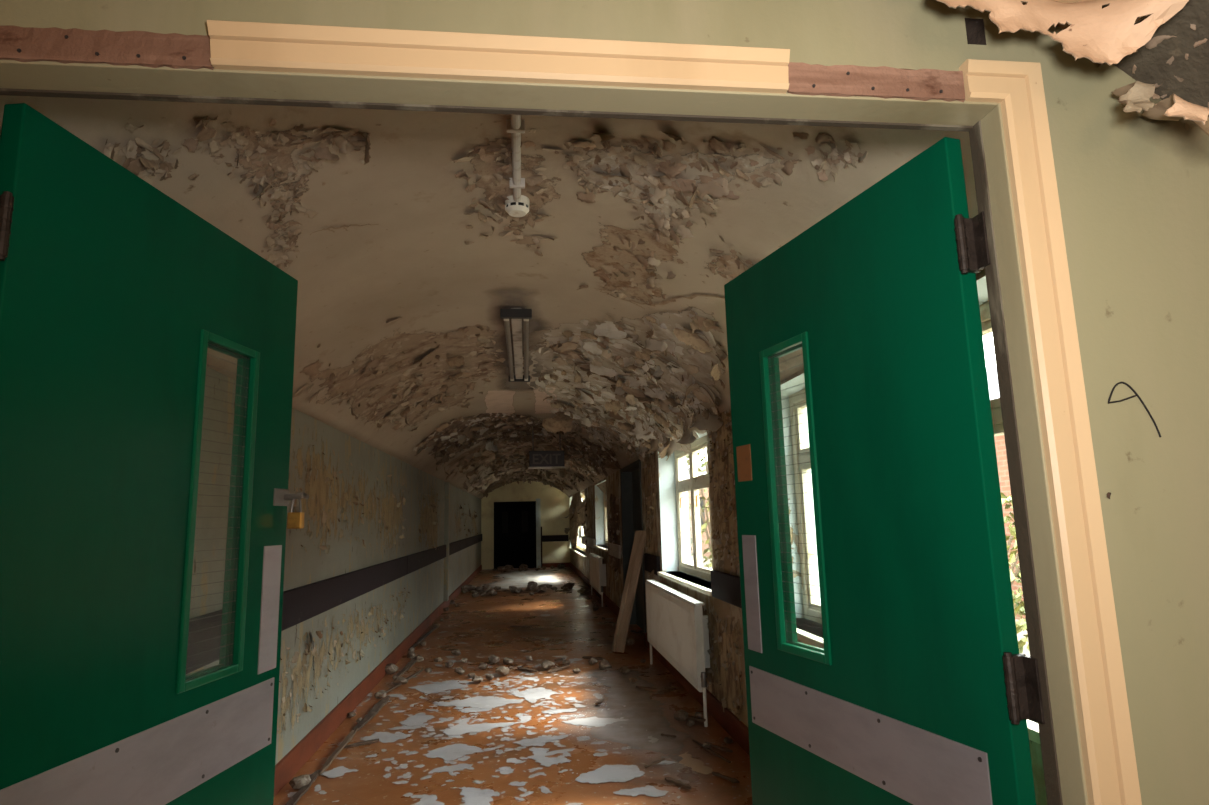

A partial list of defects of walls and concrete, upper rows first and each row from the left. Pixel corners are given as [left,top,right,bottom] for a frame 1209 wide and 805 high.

peeling [936,0,1209,125]
peeling [103,110,381,270]
peeling [294,129,868,581]